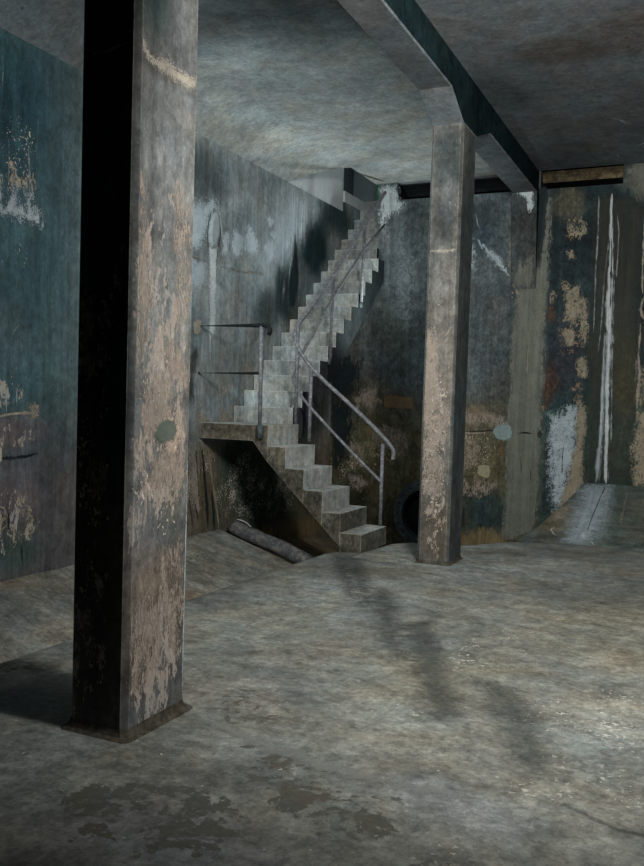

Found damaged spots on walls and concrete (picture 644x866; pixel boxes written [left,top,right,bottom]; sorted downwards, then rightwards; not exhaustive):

peeling [136,162,153,375]
peeling [141,178,220,515]
damp [267,193,322,309]
peeling [550,280,590,380]
peeling [566,216,588,241]
peeling [629,226,644,487]
peeling [130,534,185,688]